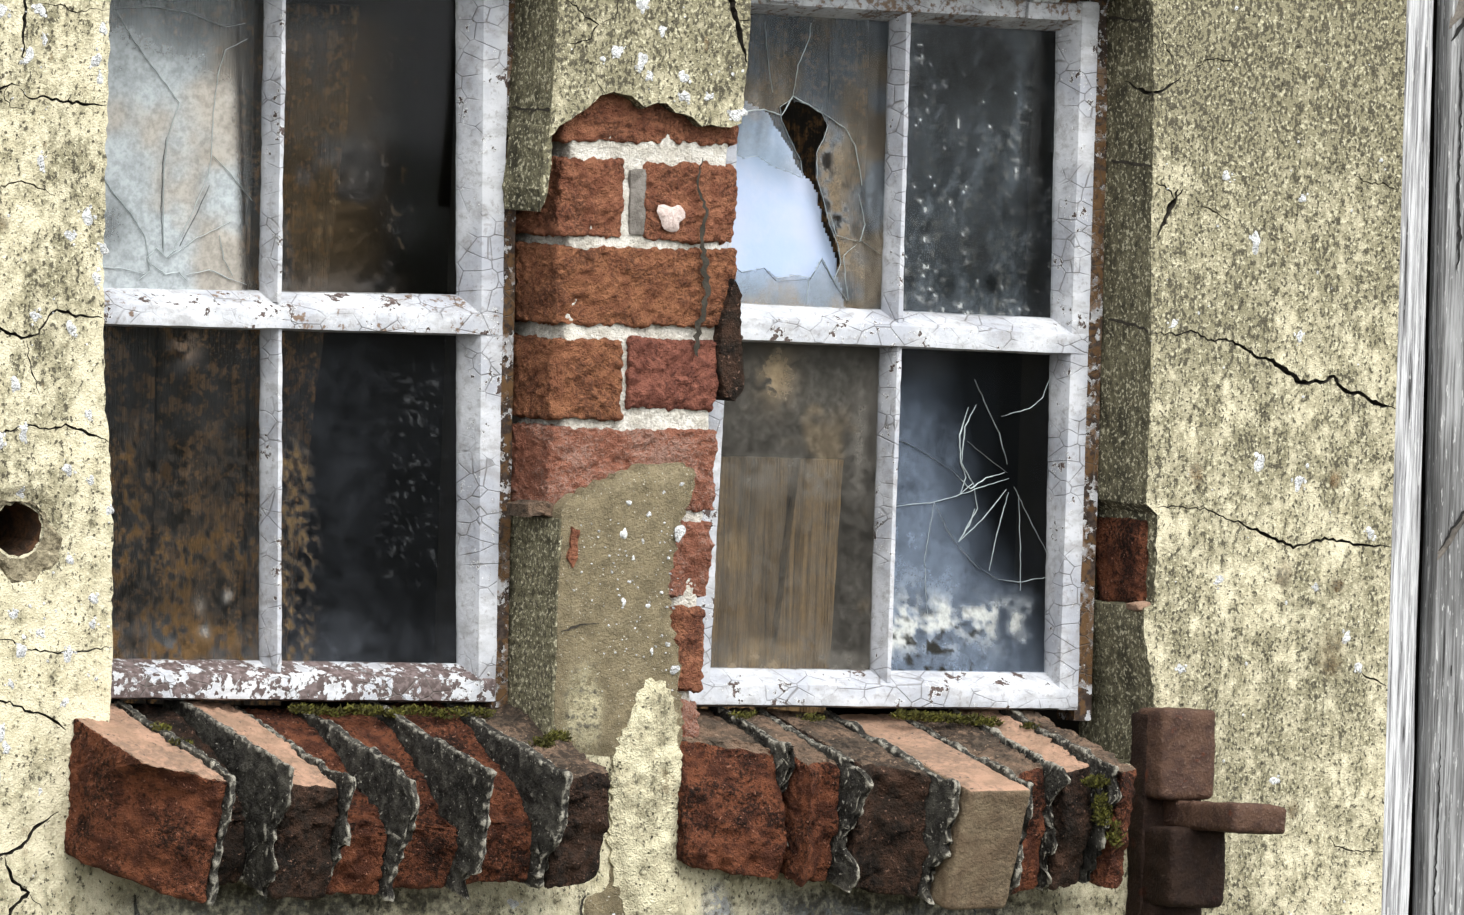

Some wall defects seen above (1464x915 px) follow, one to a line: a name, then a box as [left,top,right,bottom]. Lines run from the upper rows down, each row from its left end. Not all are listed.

crack [0,0,109,109]
crack [728,0,749,69]
crack [0,180,53,195]
crack [0,309,107,441]
crack [1109,318,1396,409]
spalling [502,93,745,915]
crack [1157,505,1391,549]
crack [0,639,112,654]
crack [0,700,66,730]
crack [0,812,58,915]
crack [133,895,141,915]